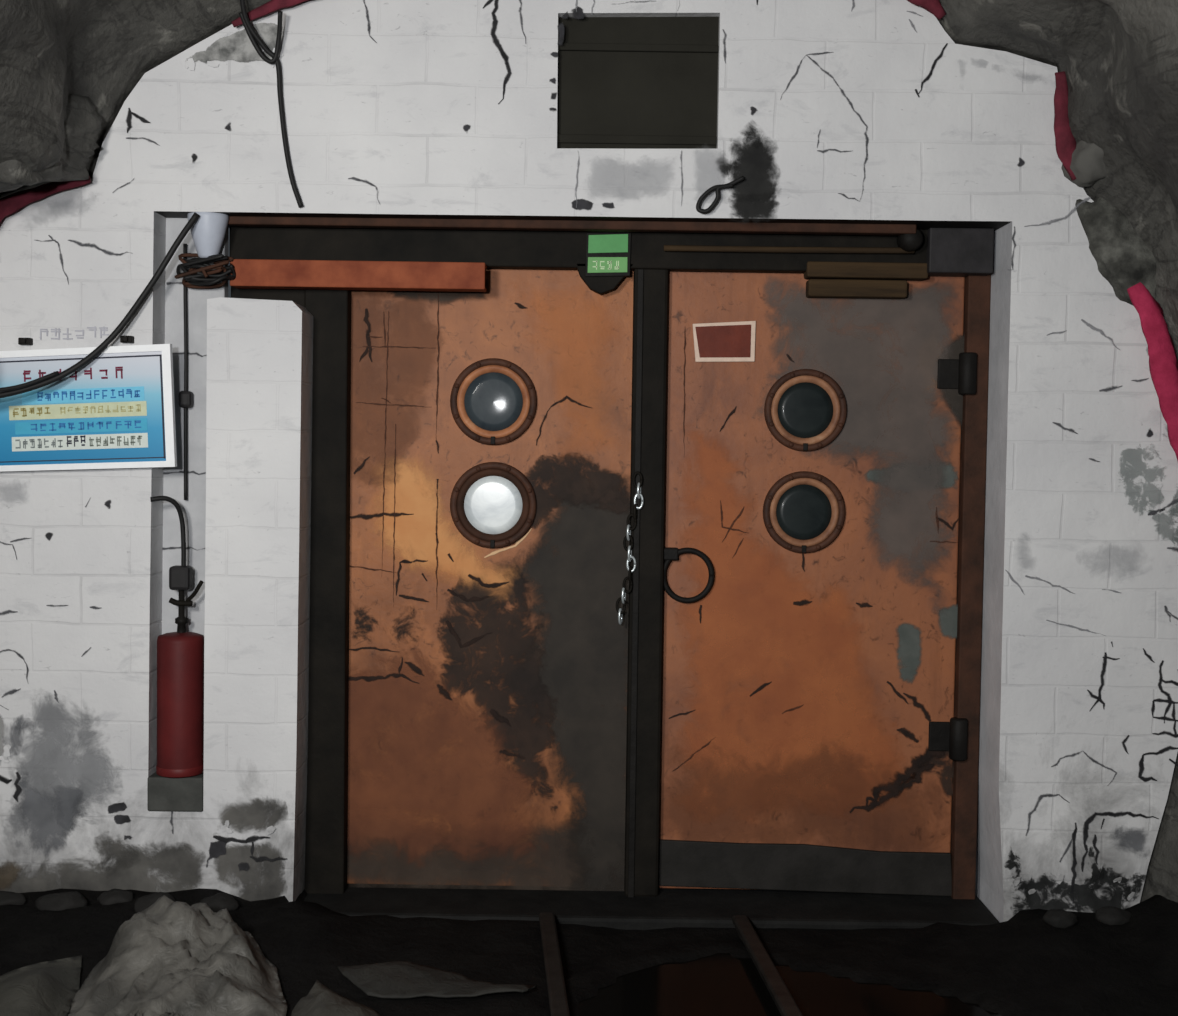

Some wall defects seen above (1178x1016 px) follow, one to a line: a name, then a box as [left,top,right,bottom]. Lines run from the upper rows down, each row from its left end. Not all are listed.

crack [483,0,526,104]
crack [780,52,868,202]
corrosion [379,462,506,587]
crack [1006,570,1121,595]
damp [1120,449,1178,542]
crack [0,772,22,802]
damp [0,703,203,893]
crack [1026,620,1178,904]